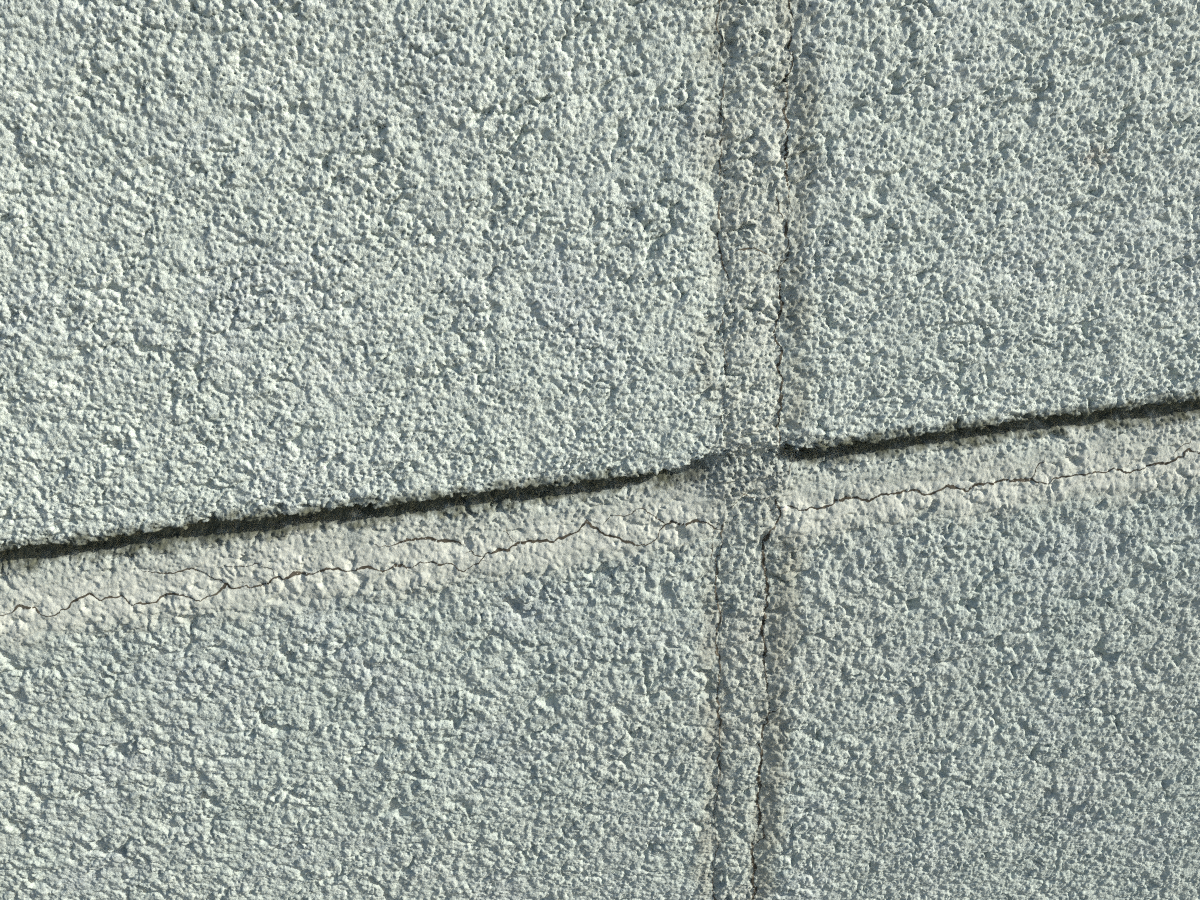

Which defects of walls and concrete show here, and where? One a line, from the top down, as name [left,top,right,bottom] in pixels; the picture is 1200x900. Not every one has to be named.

crack [716,0,794,474]
crack [0,438,1200,900]